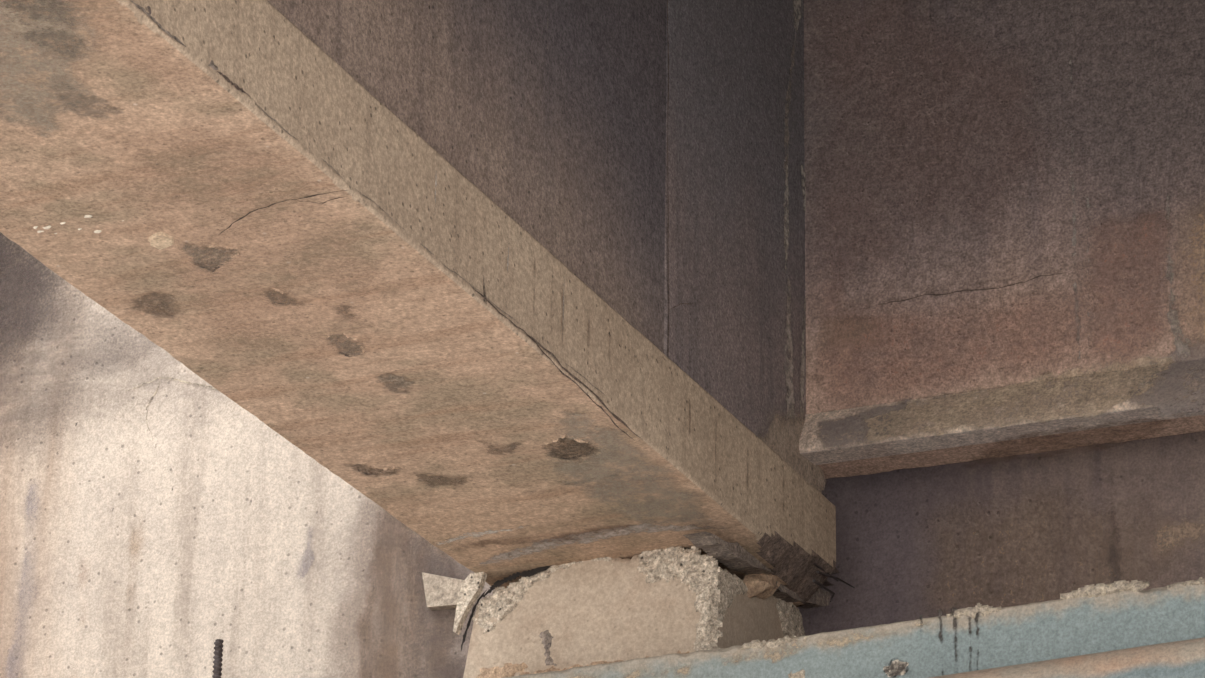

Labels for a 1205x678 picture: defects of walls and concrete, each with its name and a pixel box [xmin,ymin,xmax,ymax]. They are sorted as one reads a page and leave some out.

damp [0,0,84,130]
crack [218,189,353,236]
damp [759,48,826,493]
damp [819,258,1205,448]
spalling [453,557,615,635]
spalling [476,630,623,678]
spalling [637,531,855,654]